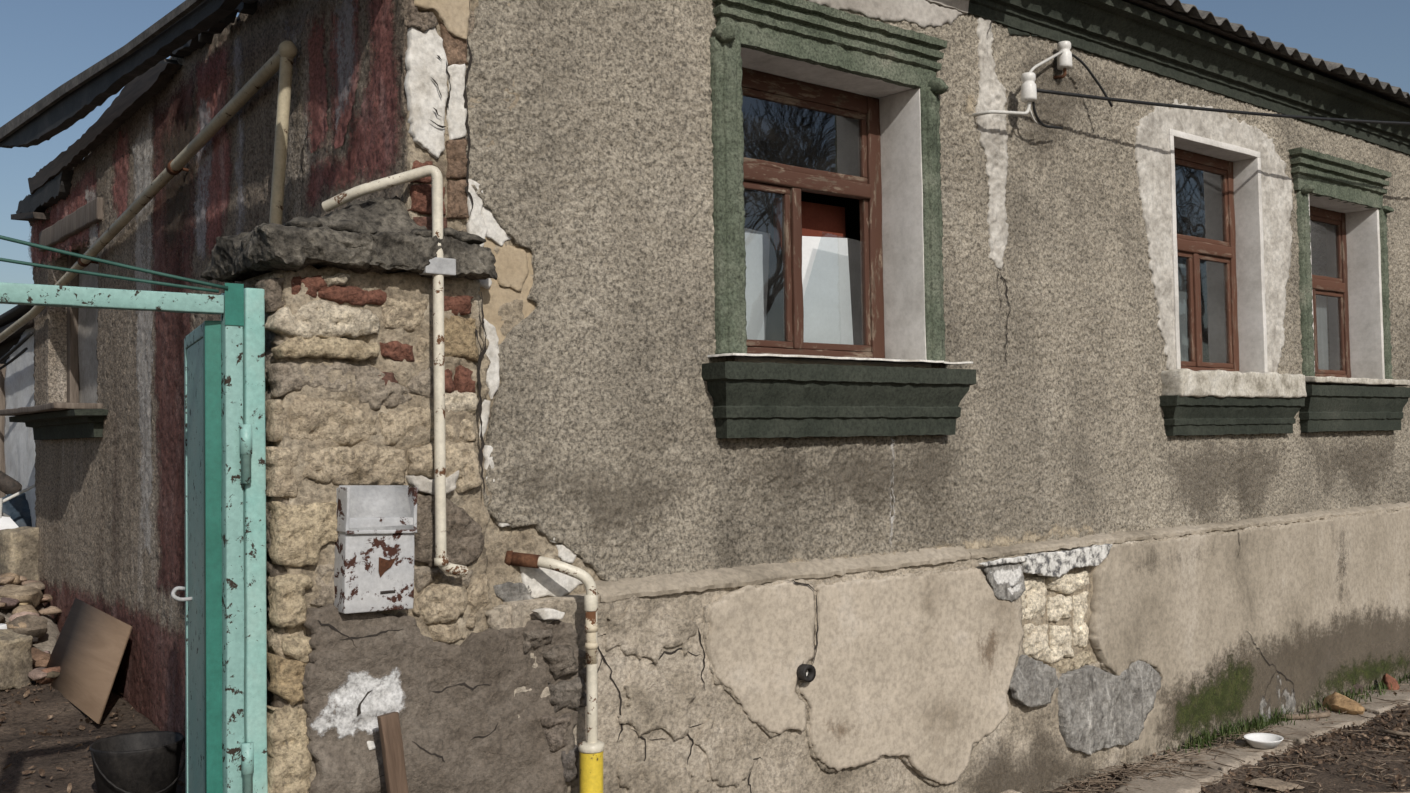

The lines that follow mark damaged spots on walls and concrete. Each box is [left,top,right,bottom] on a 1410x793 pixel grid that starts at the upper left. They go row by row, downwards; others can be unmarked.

crack [463,16,474,216]
peeling [304,0,535,482]
corrosion [379,557,396,577]
spalling [484,499,601,630]
crack [597,634,703,765]
crack [650,625,705,689]
crack [792,580,819,686]
spalling [795,680,845,773]
spalling [879,755,942,786]
spalling [752,509,1396,674]
spalling [1258,676,1296,722]
water stain [1157,605,1410,745]